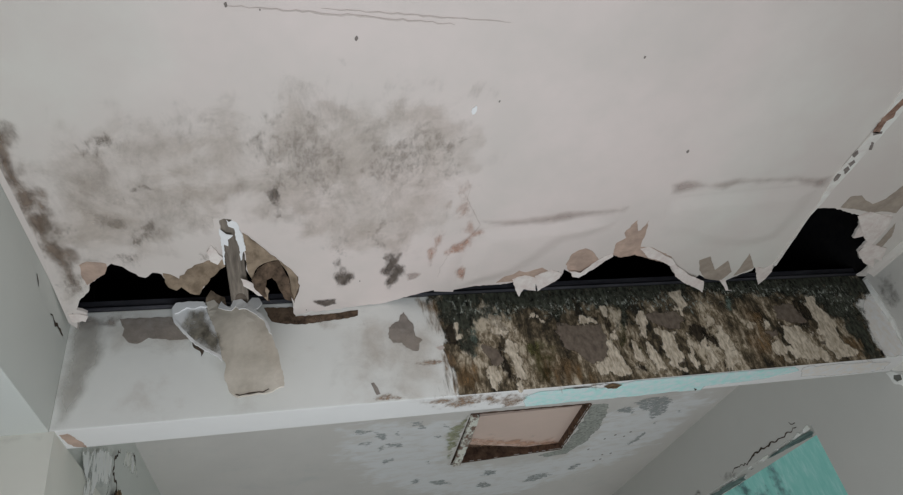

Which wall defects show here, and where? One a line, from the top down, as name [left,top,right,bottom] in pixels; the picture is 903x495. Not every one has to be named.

mould [0,132,76,285]
peeling [207,220,246,265]
peeling [841,186,903,268]
peeling [241,260,358,325]
mould [335,272,353,285]
mould [381,255,418,285]
peeling [512,253,613,296]
peeling [641,247,773,292]
peeling [108,317,204,356]
spalling [388,312,422,351]
damp [420,276,903,395]
damp [317,386,735,495]